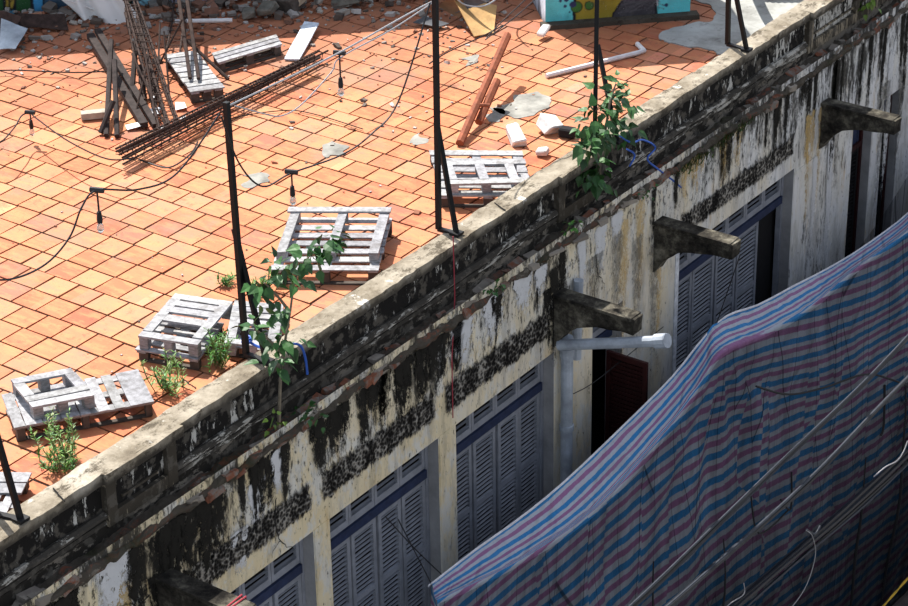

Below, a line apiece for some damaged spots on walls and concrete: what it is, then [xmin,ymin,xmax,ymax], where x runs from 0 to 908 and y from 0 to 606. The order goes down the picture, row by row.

peeling [732,122,741,159]
damp [764,95,790,170]
damp [801,73,819,143]
spalling [763,0,908,113]
damp [858,28,888,110]
damp [899,13,908,111]
damp [483,283,516,348]
damp [529,251,567,361]
spalling [296,341,405,433]
damp [307,320,464,479]
damp [122,441,291,606]
damp [46,585,83,606]